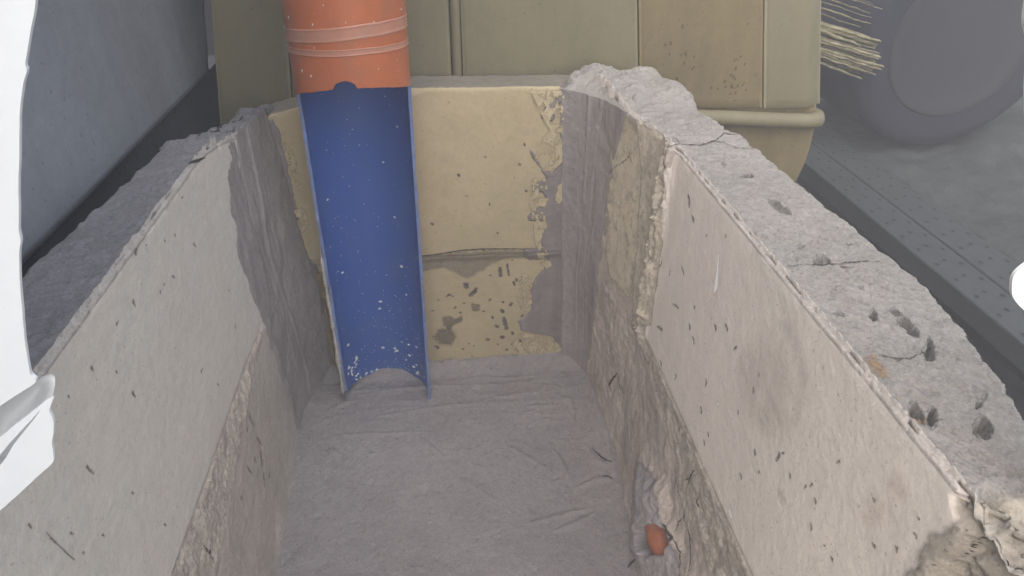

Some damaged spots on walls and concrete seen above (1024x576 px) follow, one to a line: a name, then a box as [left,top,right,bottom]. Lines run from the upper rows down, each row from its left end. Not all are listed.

crack [667,132,752,149]
peeling [525,90,564,270]
crack [790,260,869,268]
spalling [482,299,530,351]
spalling [905,497,1024,576]